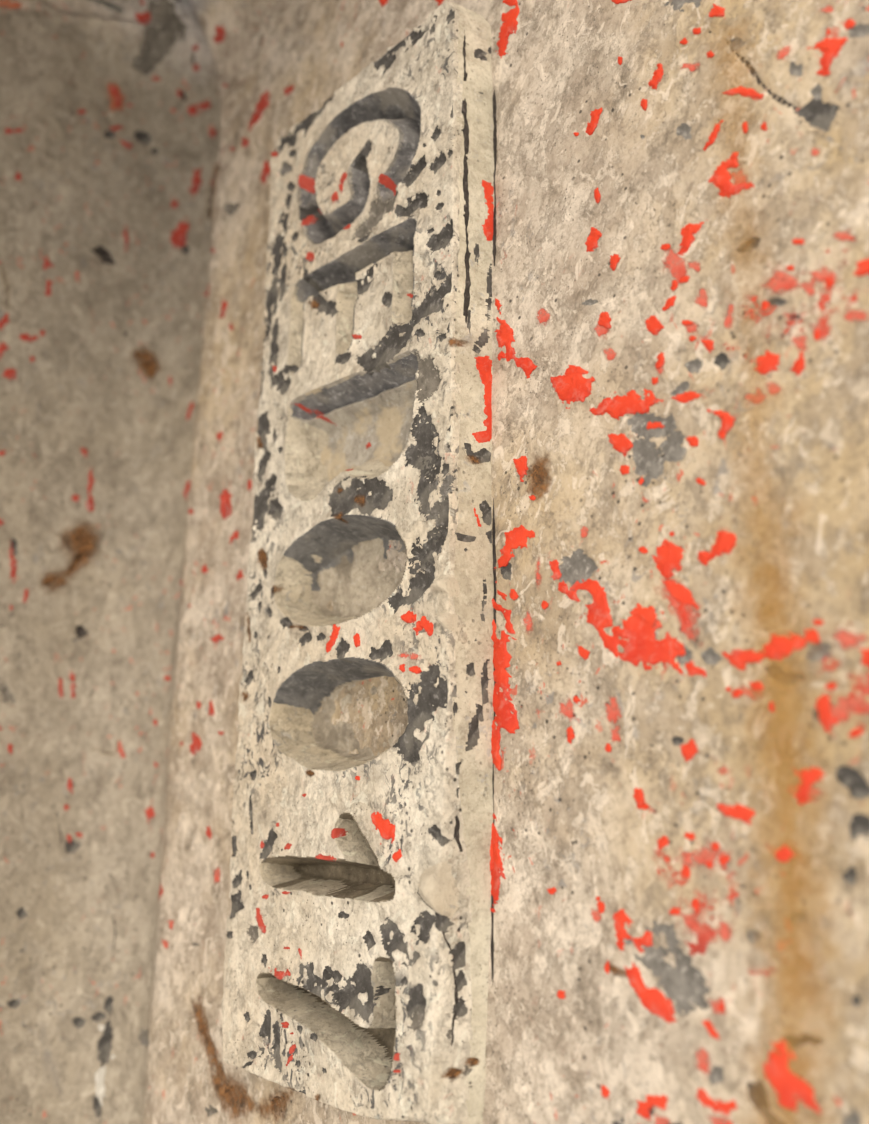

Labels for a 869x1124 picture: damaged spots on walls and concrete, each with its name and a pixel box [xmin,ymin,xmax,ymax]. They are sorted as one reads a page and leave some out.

peeling [260,95,453,426]
peeling [464,180,537,465]
peeling [550,220,869,487]
rust [42,523,98,591]
peeling [536,526,869,752]
peeling [214,868,468,1039]
peeling [490,813,506,913]
spalling [591,833,761,1040]
peeling [787,766,869,841]
rust [193,997,292,1118]
peeling [242,1009,318,1072]
peeling [695,1033,825,1124]